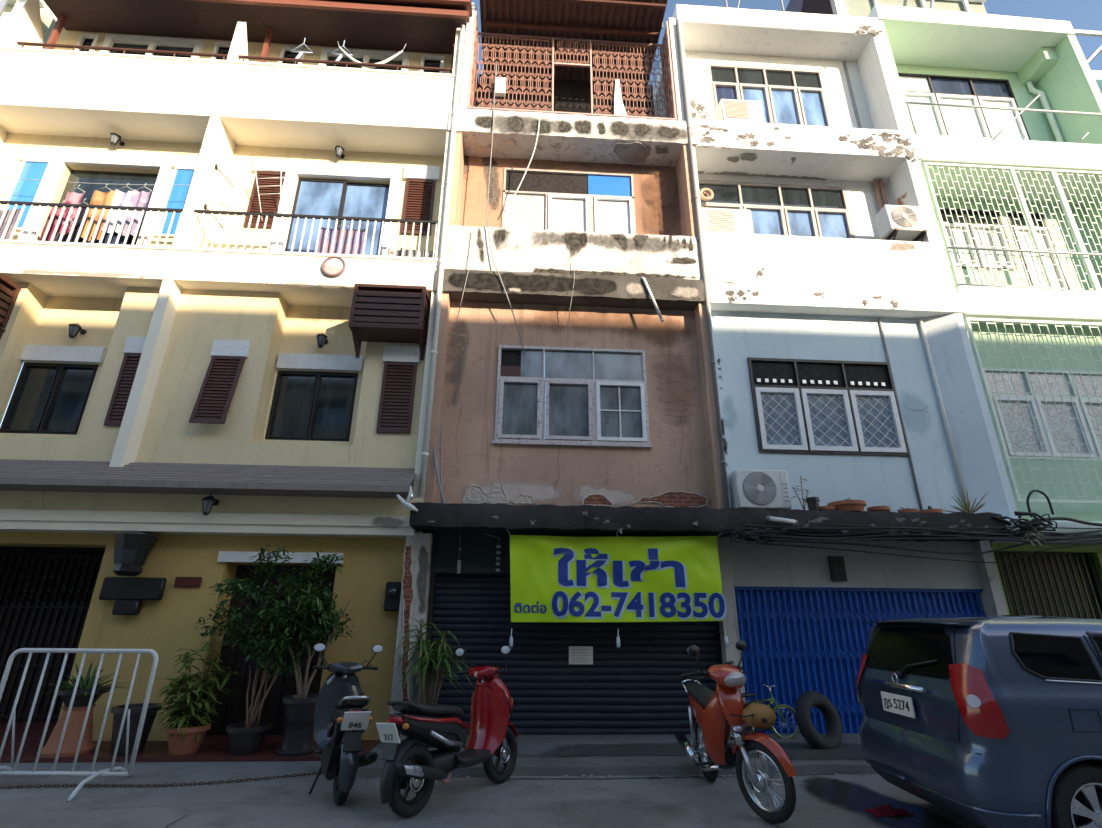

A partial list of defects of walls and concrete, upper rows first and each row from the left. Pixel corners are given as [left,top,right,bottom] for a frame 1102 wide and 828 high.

peeling [854,23,883,36]
mould [475,116,692,140]
peeling [690,98,792,149]
peeling [839,131,916,161]
damp [449,173,698,294]
peeling [707,267,765,303]
peeling [462,481,535,519]
spalling [581,493,630,533]
spalling [632,491,708,508]
spalling [399,544,415,701]